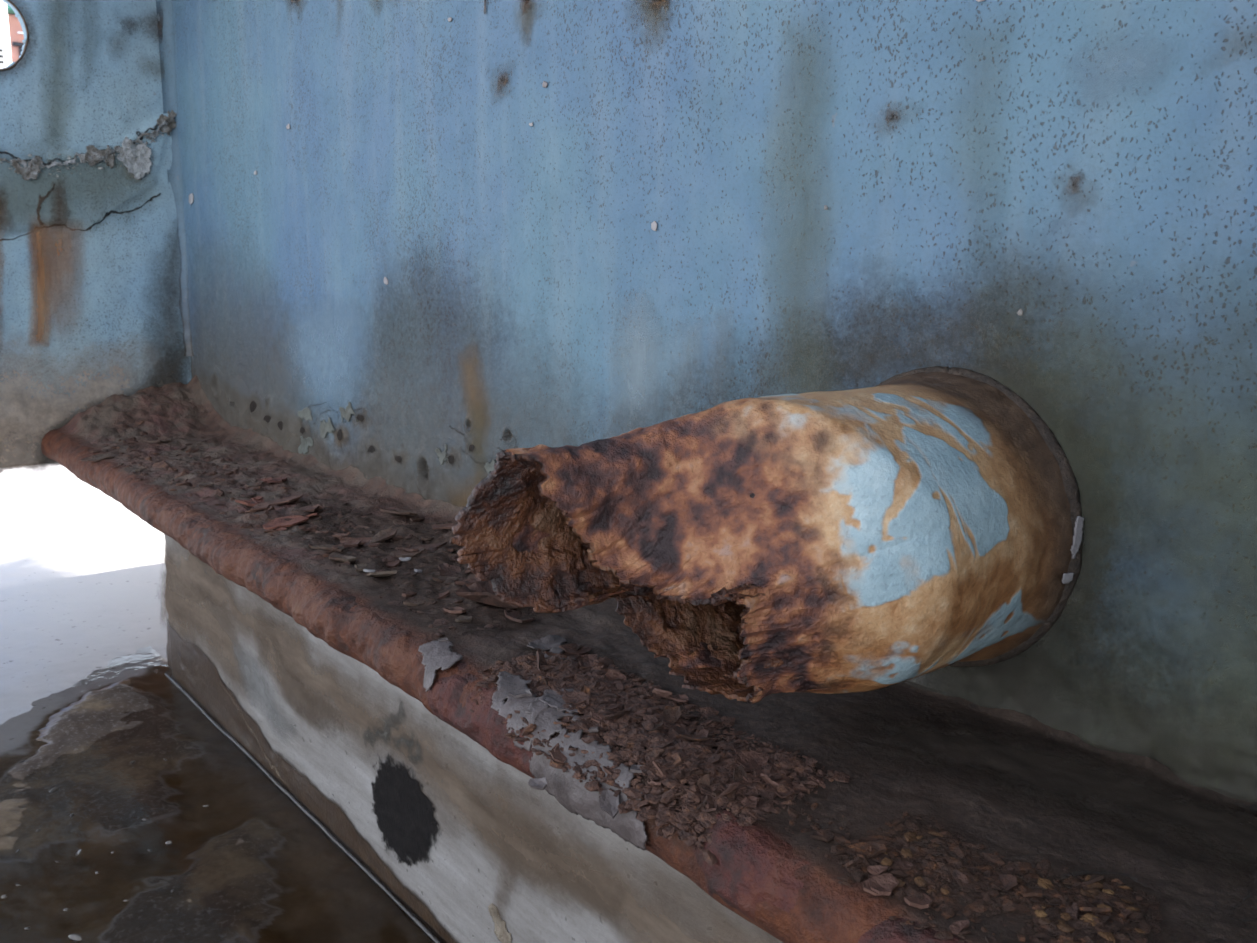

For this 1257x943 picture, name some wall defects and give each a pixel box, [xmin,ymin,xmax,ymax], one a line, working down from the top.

rust [32,185,71,343]
crack [0,184,160,241]
damp [152,244,315,455]
peeling [298,402,362,454]
damp [348,349,577,507]
peeling [418,637,463,692]
damp [162,549,783,943]
peeling [527,634,576,661]
peeling [491,671,647,851]
damp [960,659,1257,804]